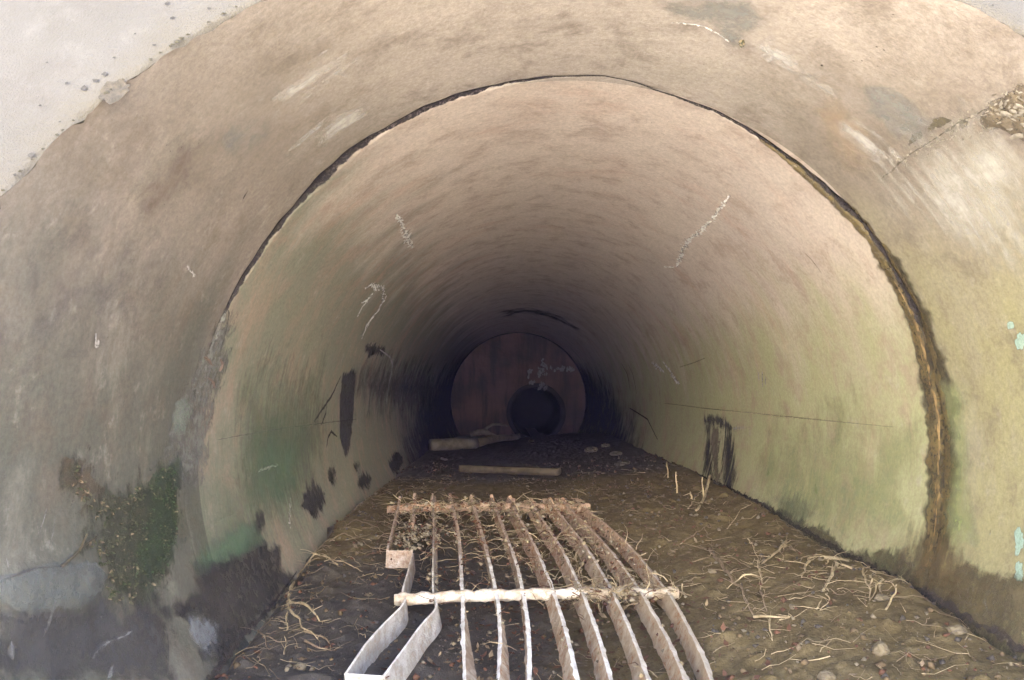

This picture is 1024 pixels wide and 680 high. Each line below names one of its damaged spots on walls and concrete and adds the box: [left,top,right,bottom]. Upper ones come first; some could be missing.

crack [882,90,1023,178]
spalling [979,85,1024,140]
spalling [164,310,232,486]
damp [0,510,297,680]